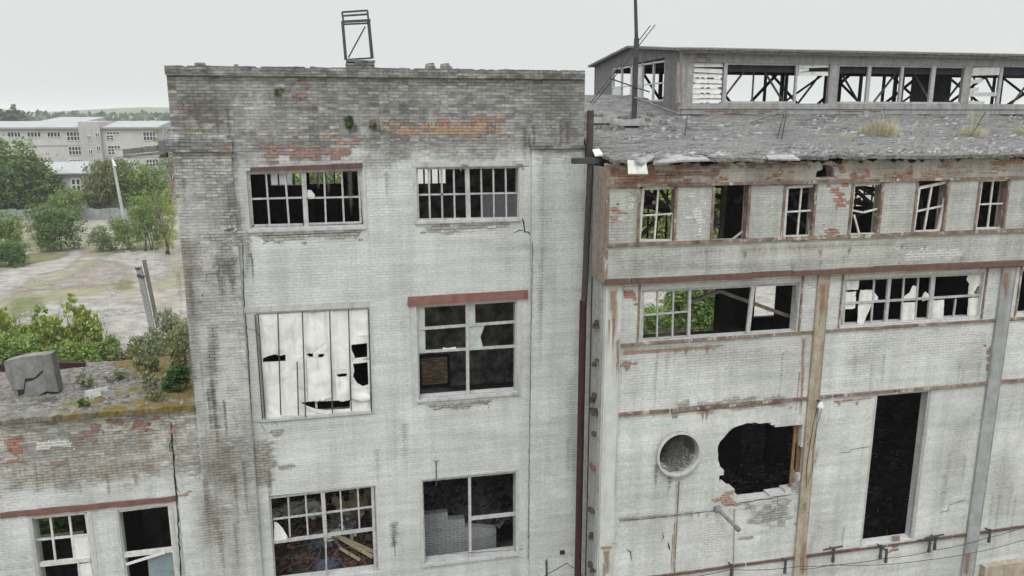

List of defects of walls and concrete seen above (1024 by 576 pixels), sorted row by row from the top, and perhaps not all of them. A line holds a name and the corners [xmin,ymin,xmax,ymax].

spalling [370,117,507,146]
spalling [827,159,855,209]
spalling [880,158,1023,183]
corrosion [609,290,719,363]
water stain [207,328,227,428]
crack [436,218,533,557]
spalling [3,416,160,466]
crack [169,423,182,576]
peeling [711,481,800,540]